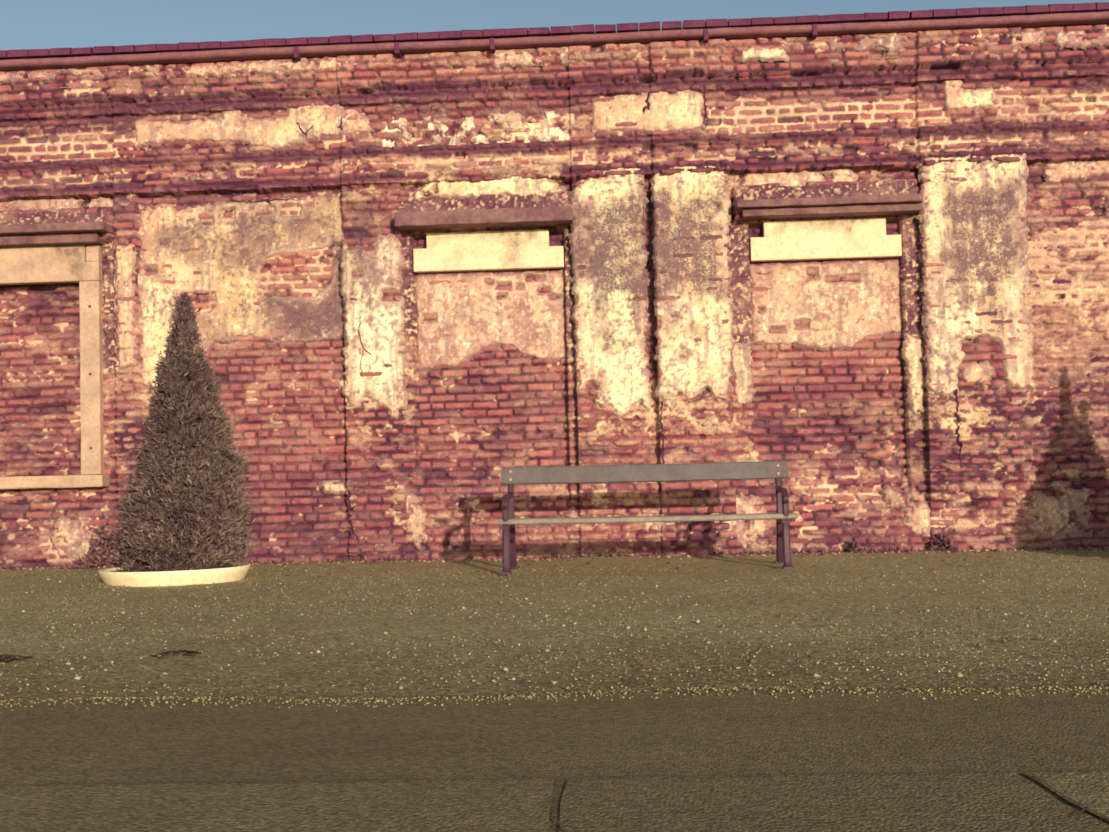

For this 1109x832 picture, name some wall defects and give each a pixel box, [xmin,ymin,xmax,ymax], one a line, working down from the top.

flaking render [135,90,707,151]
crack [642,92,650,113]
flaking render [1042,160,1109,183]
flaking render [115,153,1035,423]
crack [358,316,371,375]